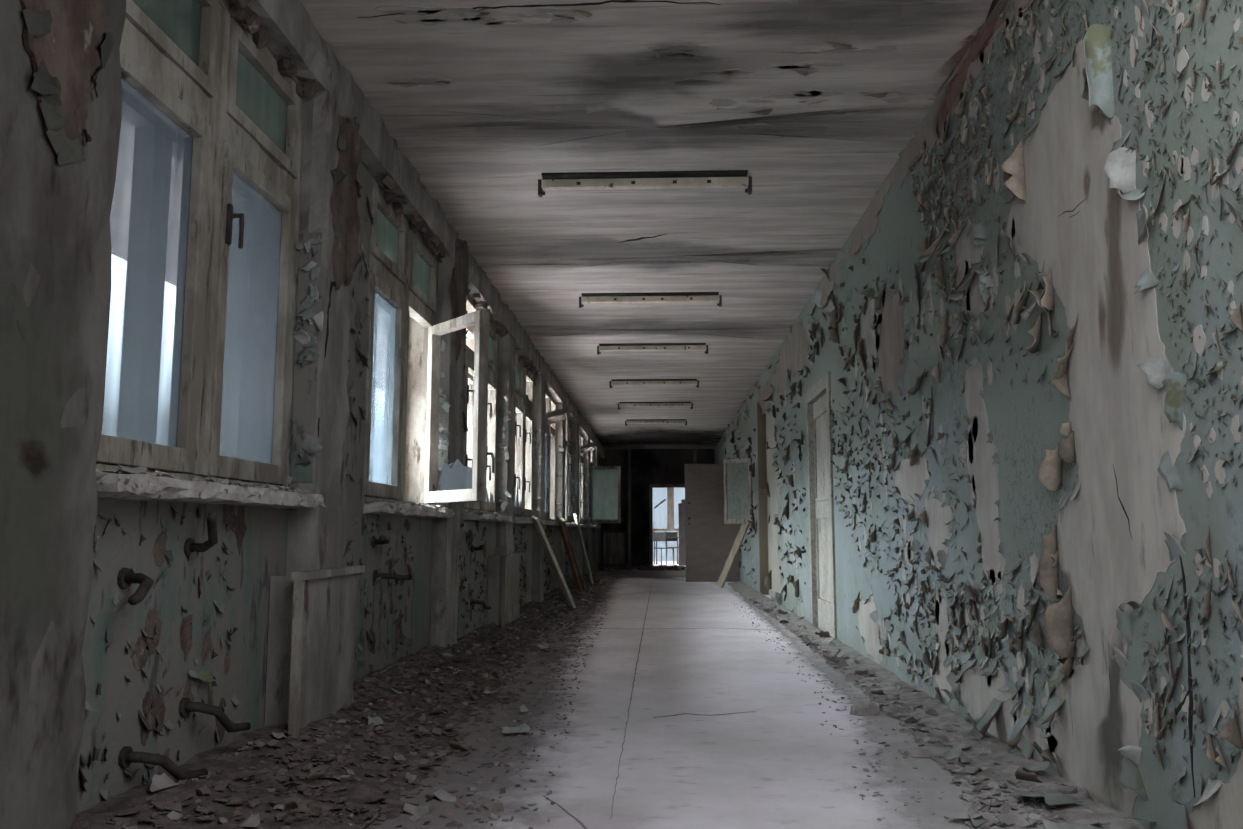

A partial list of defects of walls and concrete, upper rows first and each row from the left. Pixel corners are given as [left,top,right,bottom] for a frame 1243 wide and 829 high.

flaking render [19,0,116,166]
peeling [648,0,1243,829]
peeling [80,505,247,800]